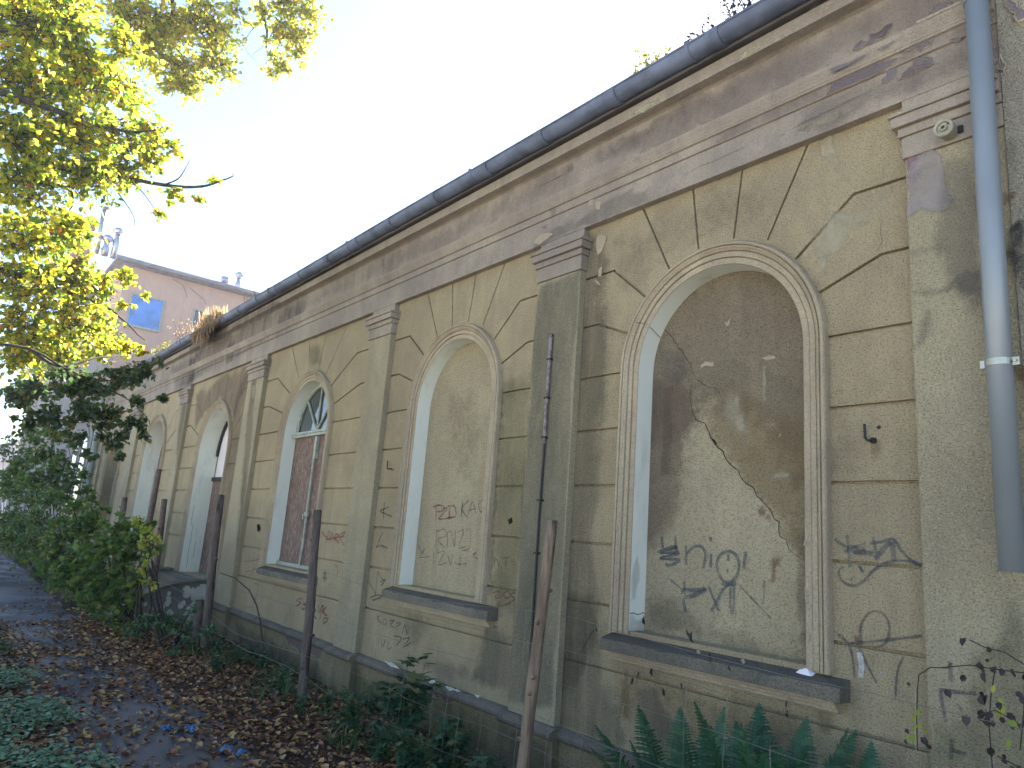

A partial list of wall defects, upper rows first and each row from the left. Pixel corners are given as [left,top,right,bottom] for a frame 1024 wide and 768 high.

peeling [825,23,934,96]
peeling [907,150,951,216]
crack [636,322,804,561]
peeling [134,584,206,625]